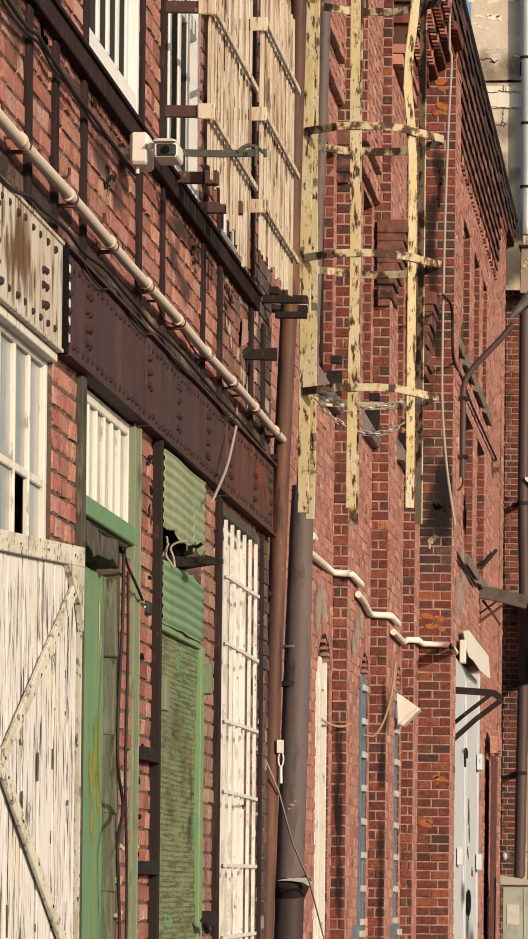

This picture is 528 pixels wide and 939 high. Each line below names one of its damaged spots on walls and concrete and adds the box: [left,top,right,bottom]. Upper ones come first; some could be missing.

peeling [466,0,521,30]
rust [4,201,36,309]